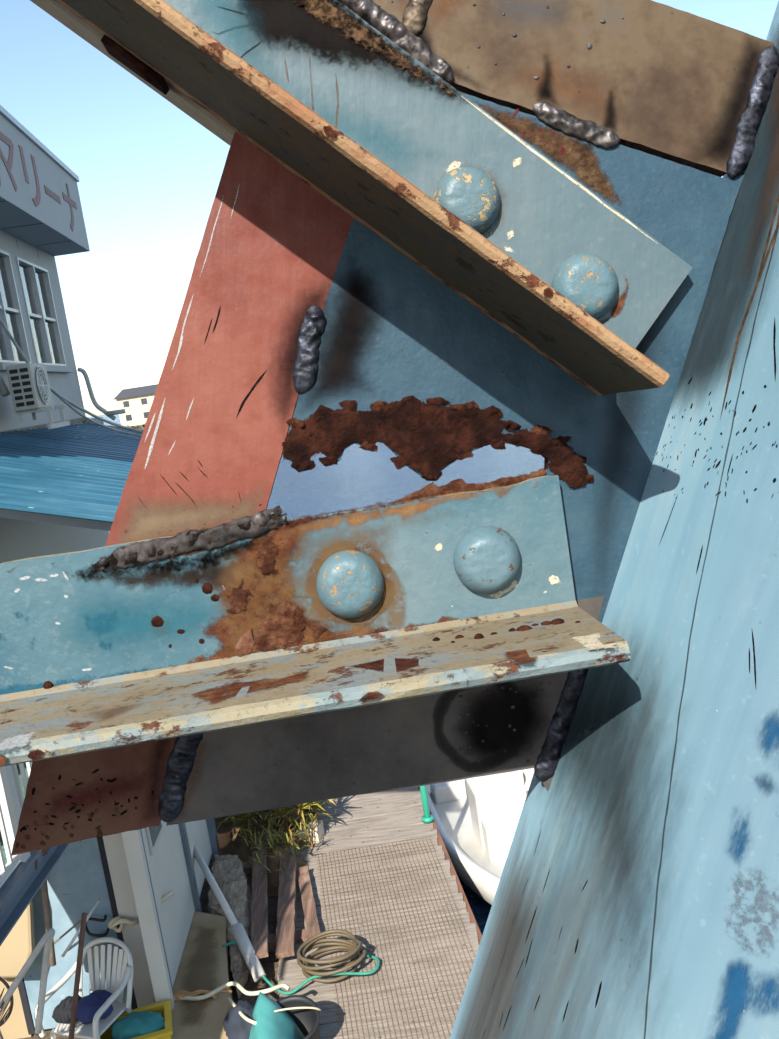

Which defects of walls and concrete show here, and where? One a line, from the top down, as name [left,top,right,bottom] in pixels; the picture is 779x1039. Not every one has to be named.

corrosion [323,125,337,137]
corrosion [115,395,594,664]
peeling [14,571,68,593]
corrosion [352,658,419,672]
corrosion [193,672,308,704]
corrosion [359,692,383,702]
corrosion [27,749,43,760]